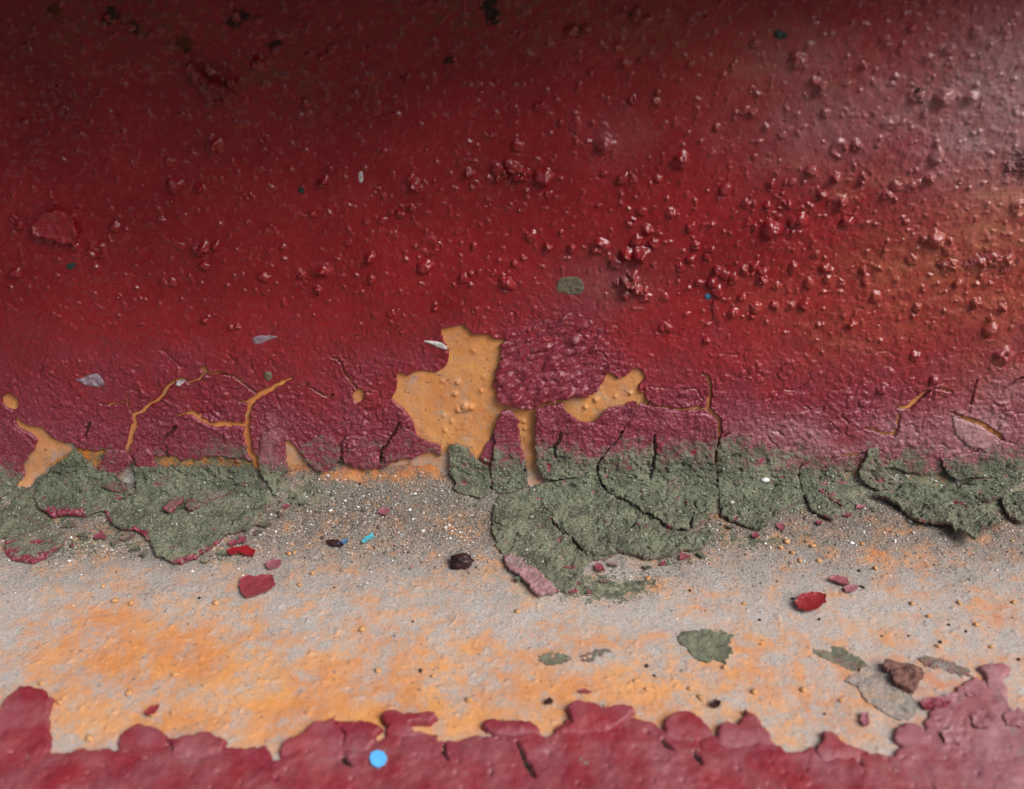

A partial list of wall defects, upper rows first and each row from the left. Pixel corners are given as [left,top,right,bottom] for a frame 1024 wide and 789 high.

crack [109,356,358,469]
peeling [0,312,849,594]
crack [550,432,561,458]
crack [596,431,623,499]
crack [636,371,721,483]
crack [822,387,1003,460]
peeling [859,417,1024,541]
peeling [0,686,56,750]
peeling [118,704,228,758]
peeling [279,710,438,759]
peeling [560,700,635,734]
peeling [663,710,771,748]